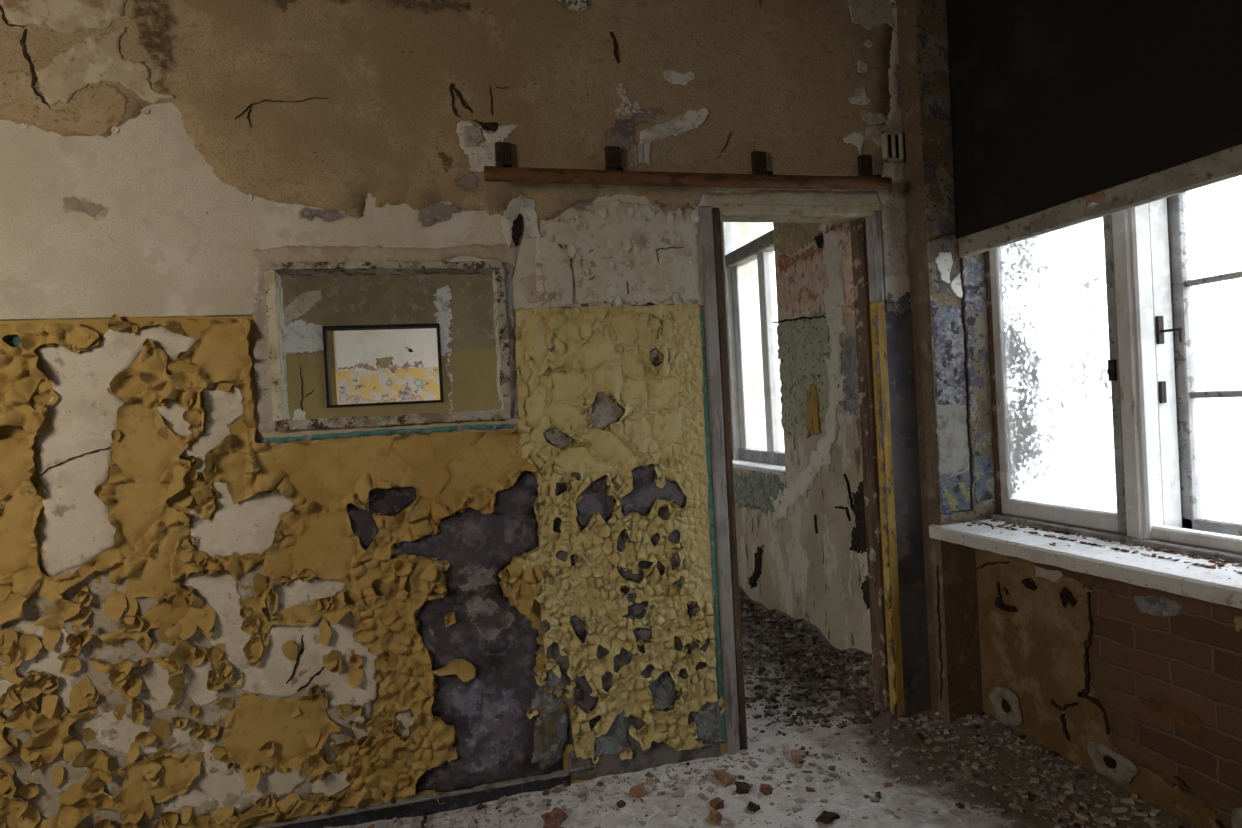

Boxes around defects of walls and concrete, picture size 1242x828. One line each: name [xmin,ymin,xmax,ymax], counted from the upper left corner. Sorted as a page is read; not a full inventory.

crack [0,6,48,105]
peeling [914,0,997,522]
peeling [0,0,910,828]
spalling [995,595,1018,612]
crack [1050,592,1110,740]
spalling [1021,562,1242,828]